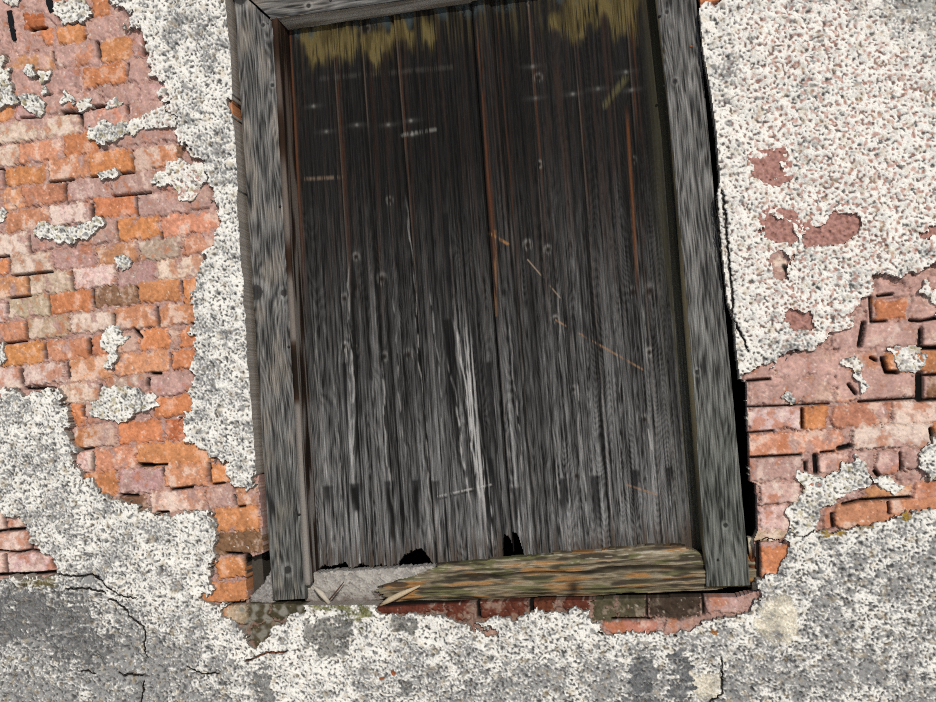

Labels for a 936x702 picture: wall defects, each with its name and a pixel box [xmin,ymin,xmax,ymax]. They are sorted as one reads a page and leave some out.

peeling [918,226,936,240]
spalling [0,0,310,647]
spalling [740,264,936,578]
crack [61,574,148,702]
spalling [377,588,761,636]